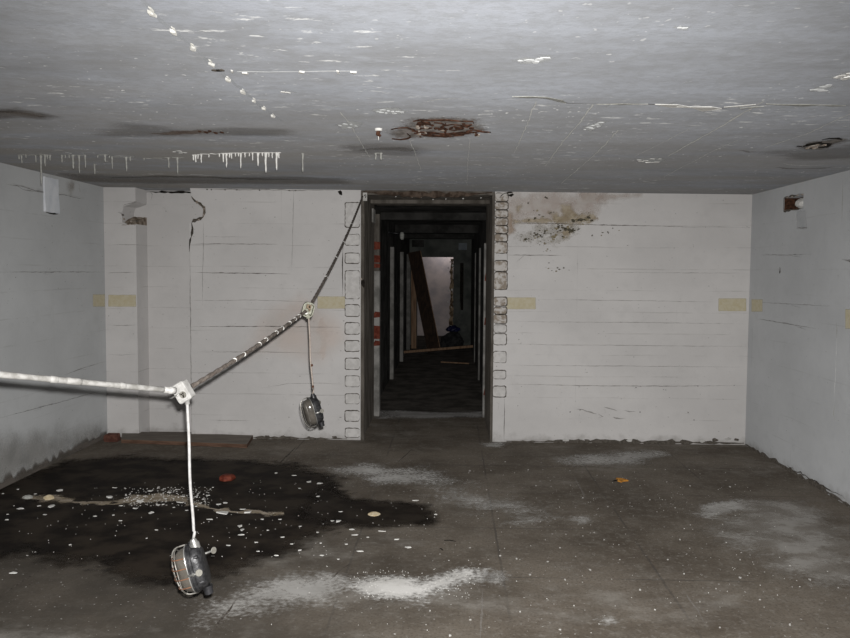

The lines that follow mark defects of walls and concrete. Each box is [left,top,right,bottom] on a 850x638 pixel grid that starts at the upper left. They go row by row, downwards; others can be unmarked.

crack [507,96,846,166]
spalling [797,138,847,149]
damp [507,202,596,252]
damp [0,432,107,489]